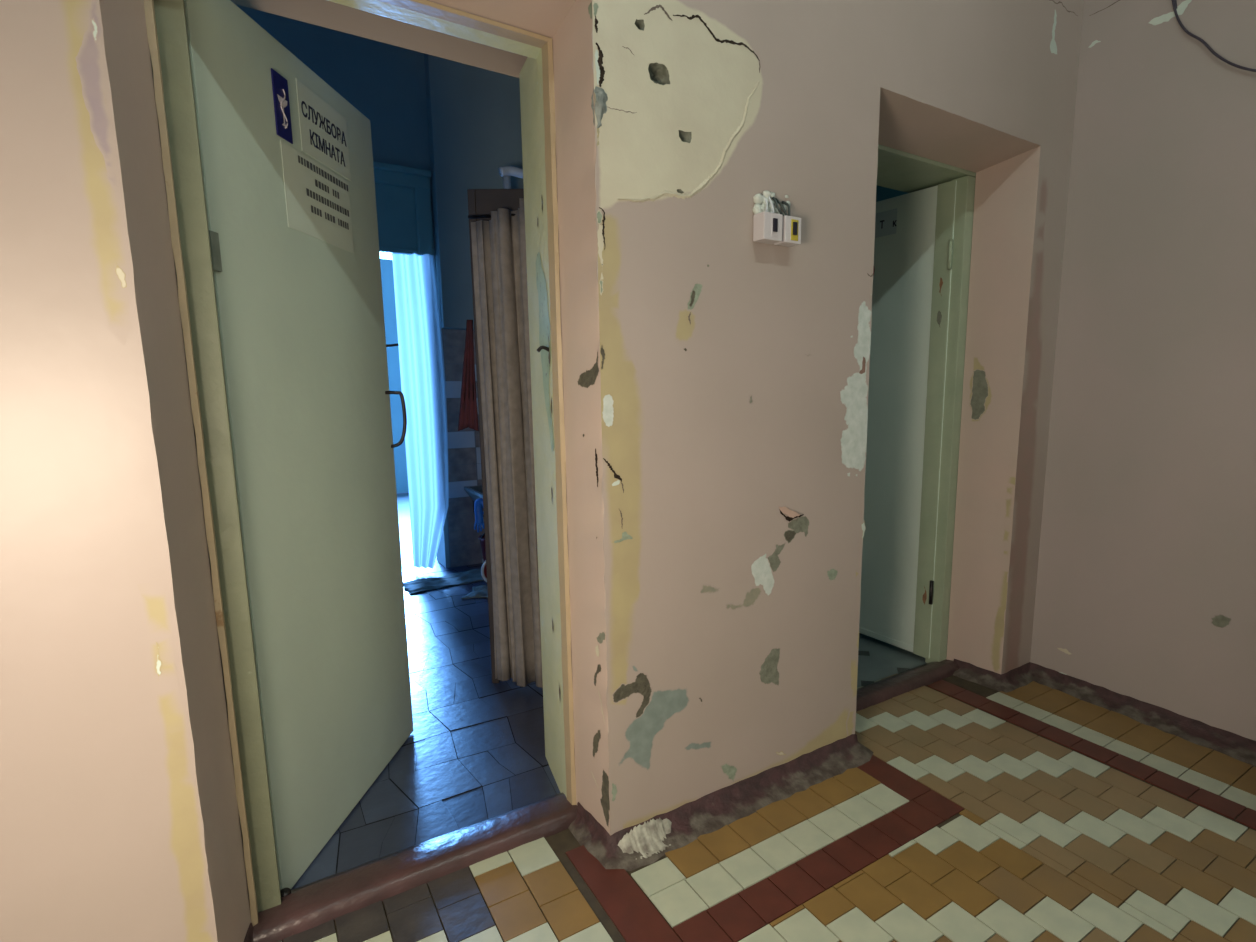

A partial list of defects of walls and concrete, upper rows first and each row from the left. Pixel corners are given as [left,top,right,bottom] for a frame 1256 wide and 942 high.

peeling [57,0,132,346]
peeling [536,252,554,451]
peeling [577,0,866,835]
spalling [969,356,993,422]